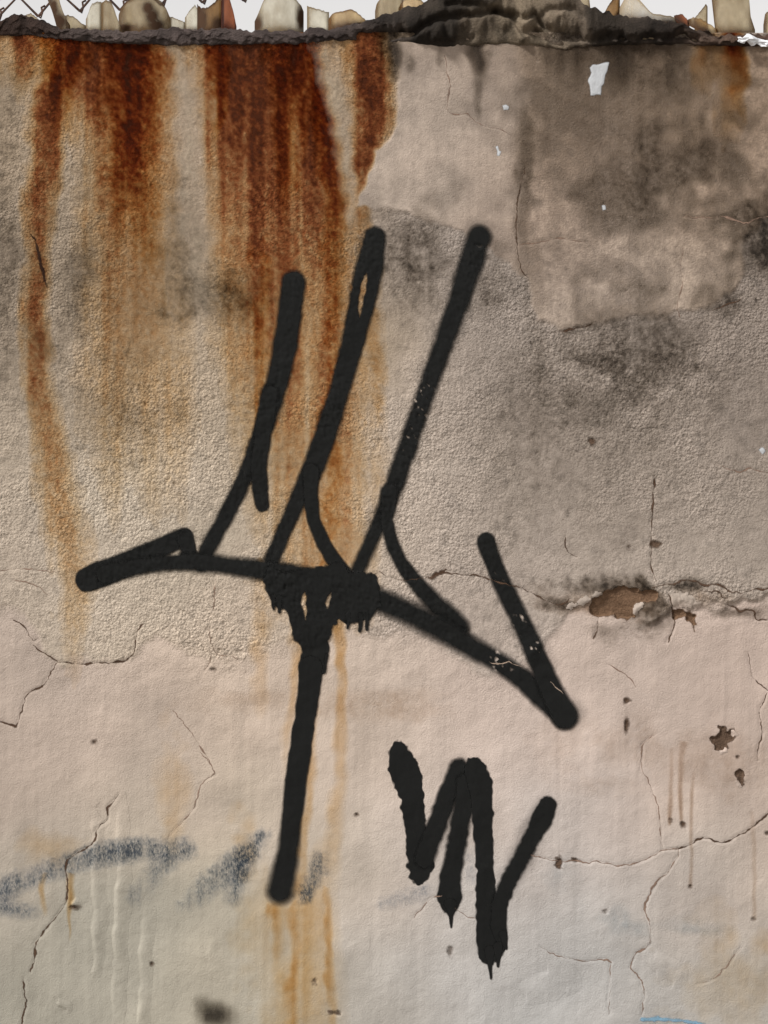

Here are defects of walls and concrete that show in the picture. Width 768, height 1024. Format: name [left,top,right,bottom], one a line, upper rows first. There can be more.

corrosion [37,39,161,175]
corrosion [204,32,337,278]
corrosion [356,32,385,173]
mould [746,218,768,266]
crack [0,620,143,728]
crack [379,569,571,605]
peeling [566,585,701,632]
crack [650,478,768,642]
spalling [710,725,745,788]
crack [748,655,767,759]
crack [21,794,119,1024]
crack [532,737,768,1015]